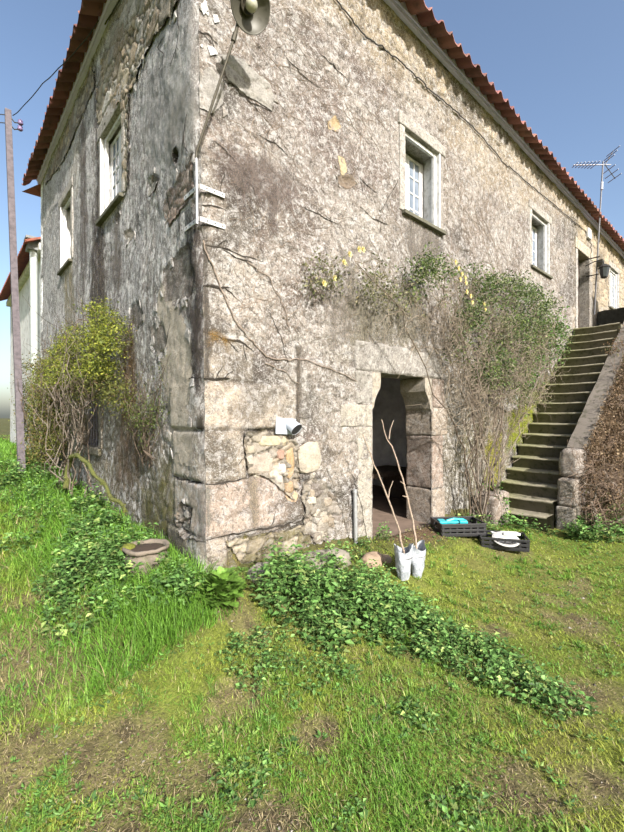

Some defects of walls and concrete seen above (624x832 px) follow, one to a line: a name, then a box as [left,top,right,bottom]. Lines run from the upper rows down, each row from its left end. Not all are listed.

crack [157,2,218,67]
peeling [199,0,219,22]
flaking render [45,0,177,196]
leakage [65,122,121,332]
flaking render [163,146,195,227]
flaking render [334,156,359,189]
crack [360,178,400,225]
leakage [186,217,211,389]
flaking render [174,498,192,540]
flaking render [226,427,342,564]